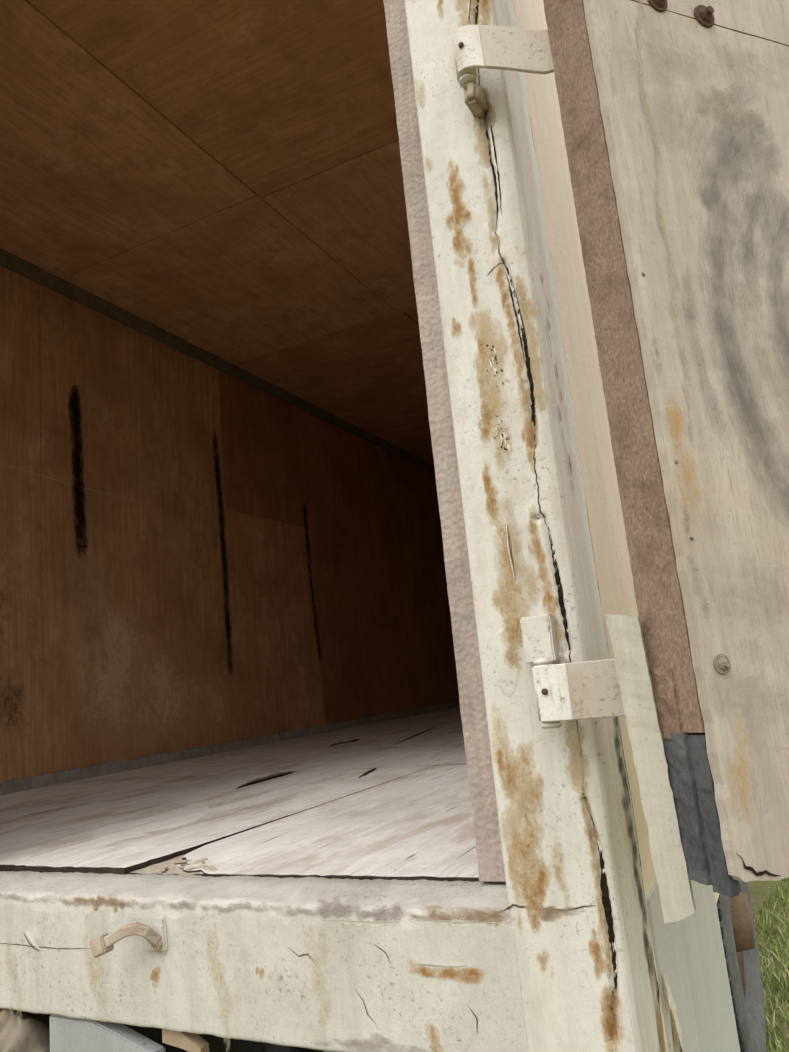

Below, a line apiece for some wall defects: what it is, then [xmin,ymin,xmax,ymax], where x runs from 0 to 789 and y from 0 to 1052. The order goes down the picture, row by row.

crack [467,0,479,25]
rust [473,88,495,165]
rust [446,162,547,465]
crack [485,116,571,663]
rust [482,467,563,668]
crack [235,771,296,789]
crack [327,739,359,747]
crack [393,727,436,745]
rust [496,721,568,930]
rust [422,905,507,919]
rust [566,720,622,1052]
crack [736,853,780,876]